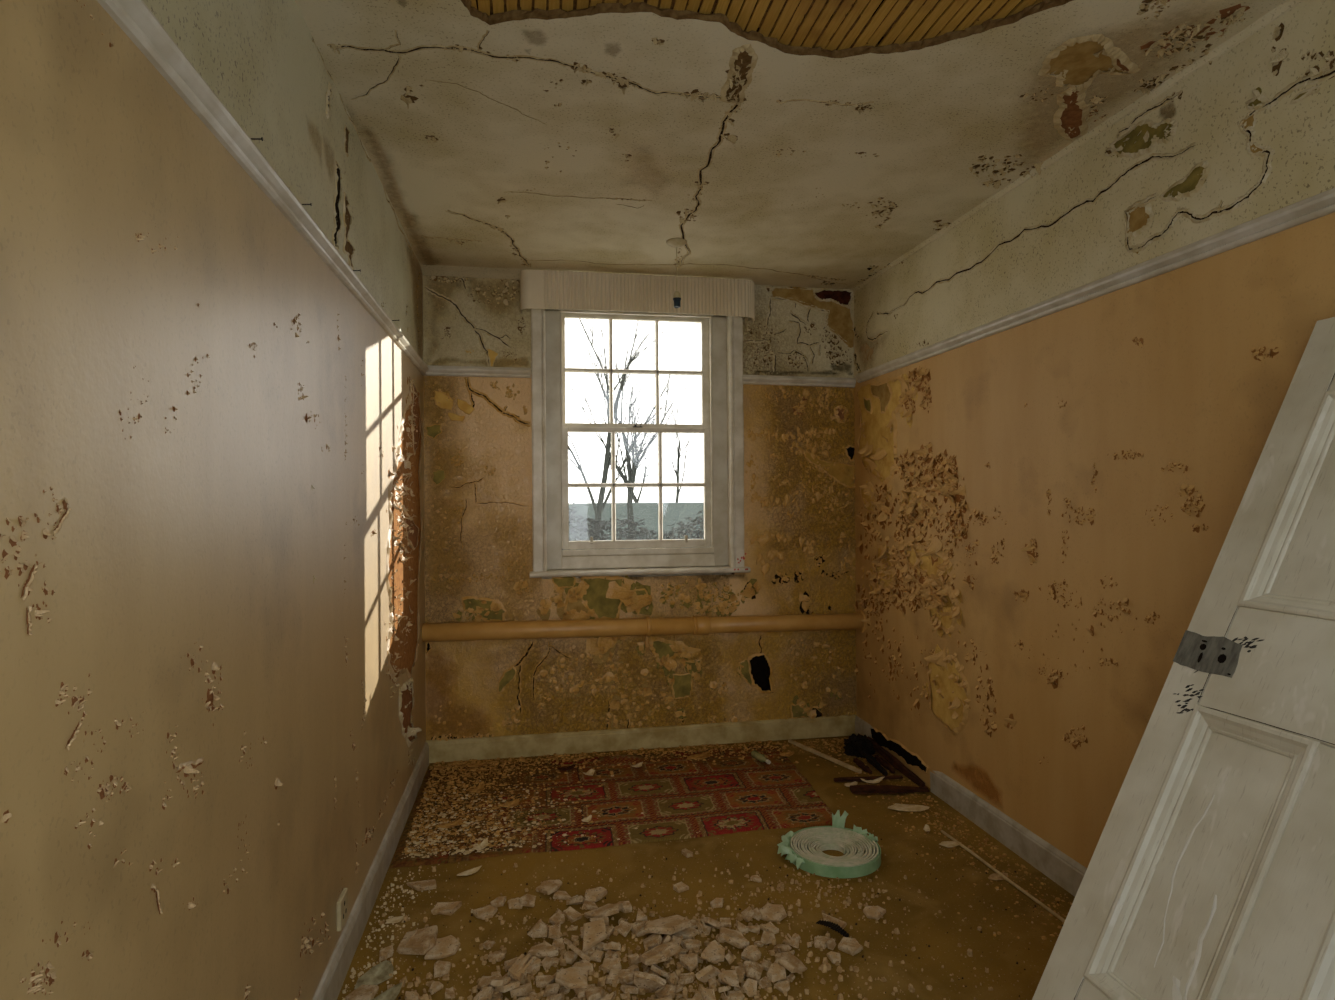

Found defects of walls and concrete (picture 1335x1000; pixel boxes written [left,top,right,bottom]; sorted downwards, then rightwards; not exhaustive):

crack [312,30,1335,372]
peeling [1019,0,1250,141]
peeling [1104,118,1178,158]
peeling [1124,160,1210,254]
peeling [1242,87,1268,158]
peeling [1269,22,1335,105]
crack [424,277,530,427]
peeling [0,486,71,635]
peeling [503,261,1039,738]
crack [1197,673,1335,745]